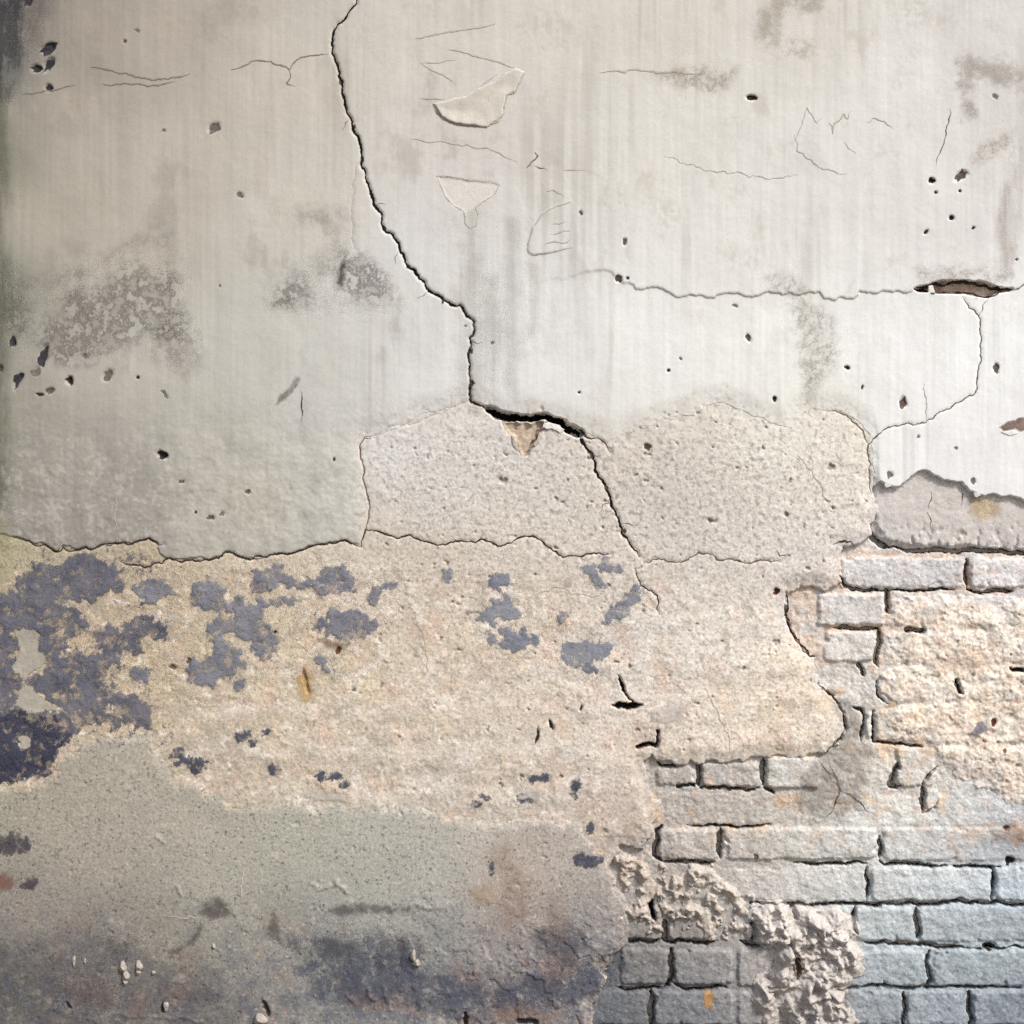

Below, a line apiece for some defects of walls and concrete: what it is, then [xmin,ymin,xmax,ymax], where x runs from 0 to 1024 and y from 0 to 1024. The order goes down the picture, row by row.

crack [14,0,790,614]
crack [631,284,913,301]
crack [831,284,1024,494]
spalling [502,421,565,456]
peeling [466,554,647,678]
peeling [0,549,402,785]
rust [297,669,311,699]
peeling [314,770,350,789]
flaking render [572,470,1024,1024]
leakage [202,899,229,918]
leakage [334,904,404,914]
leakage [302,942,623,1019]